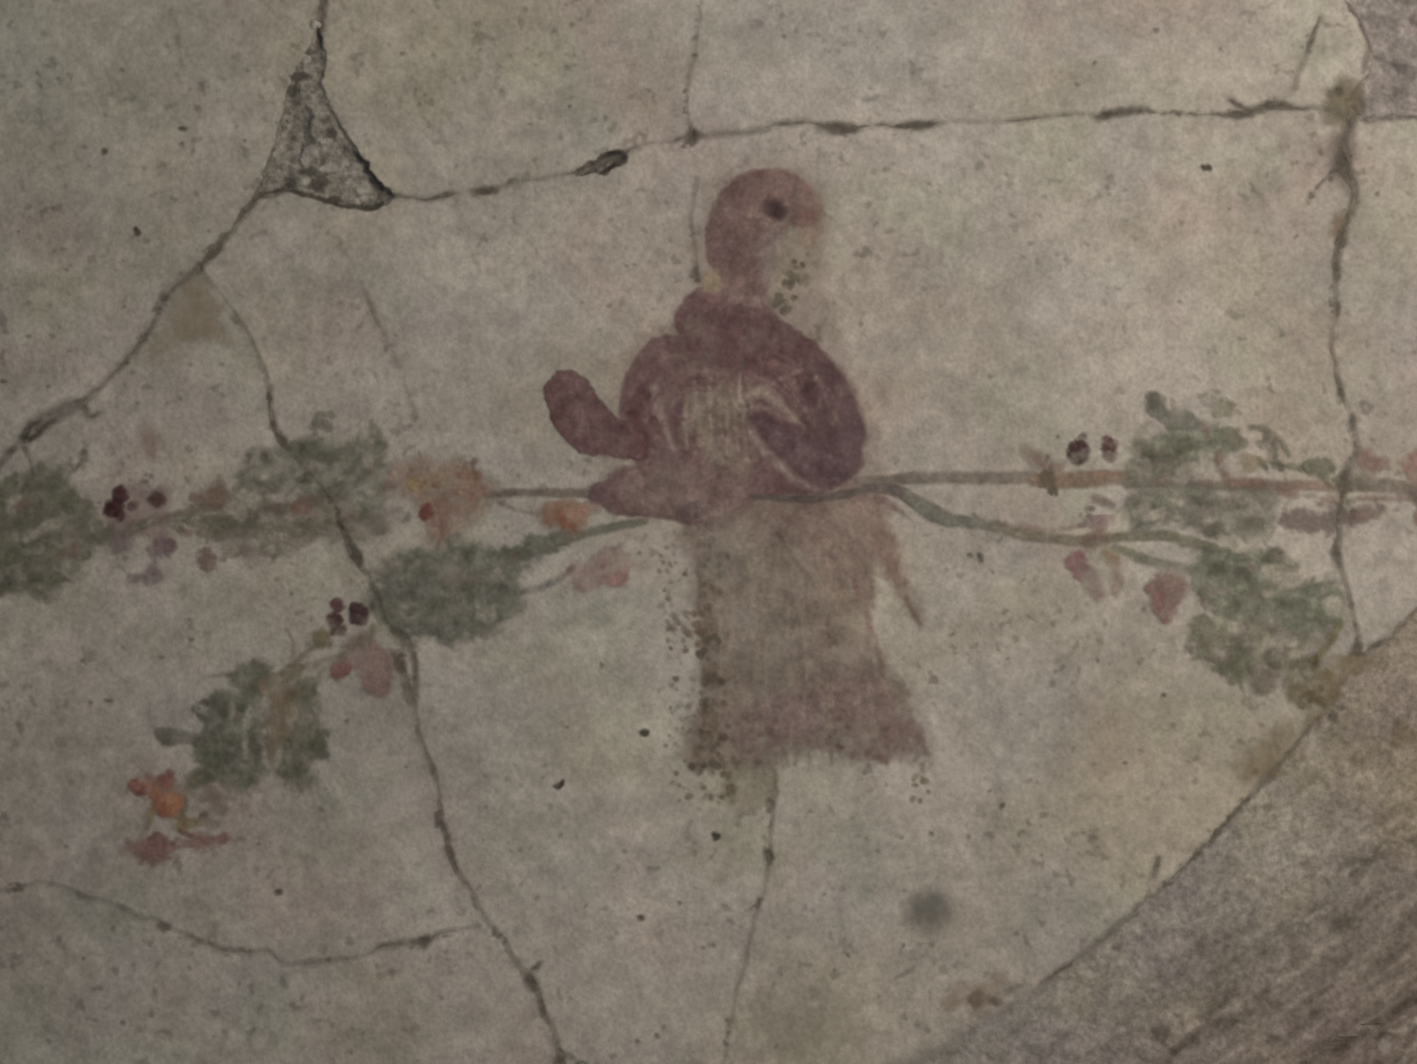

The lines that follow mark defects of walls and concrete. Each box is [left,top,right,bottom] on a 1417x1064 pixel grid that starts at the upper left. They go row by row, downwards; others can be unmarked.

crack [316,0,328,43]
spalling [254,19,395,211]
crack [375,179,514,201]
crack [780,121,939,132]
crack [1099,99,1309,118]
spalling [1345,0,1417,121]
crack [117,191,264,370]
crack [9,398,100,454]
crack [1310,108,1384,650]
crack [267,389,465,884]
spalling [912,609,1417,1064]
crack [1153,738,1301,885]